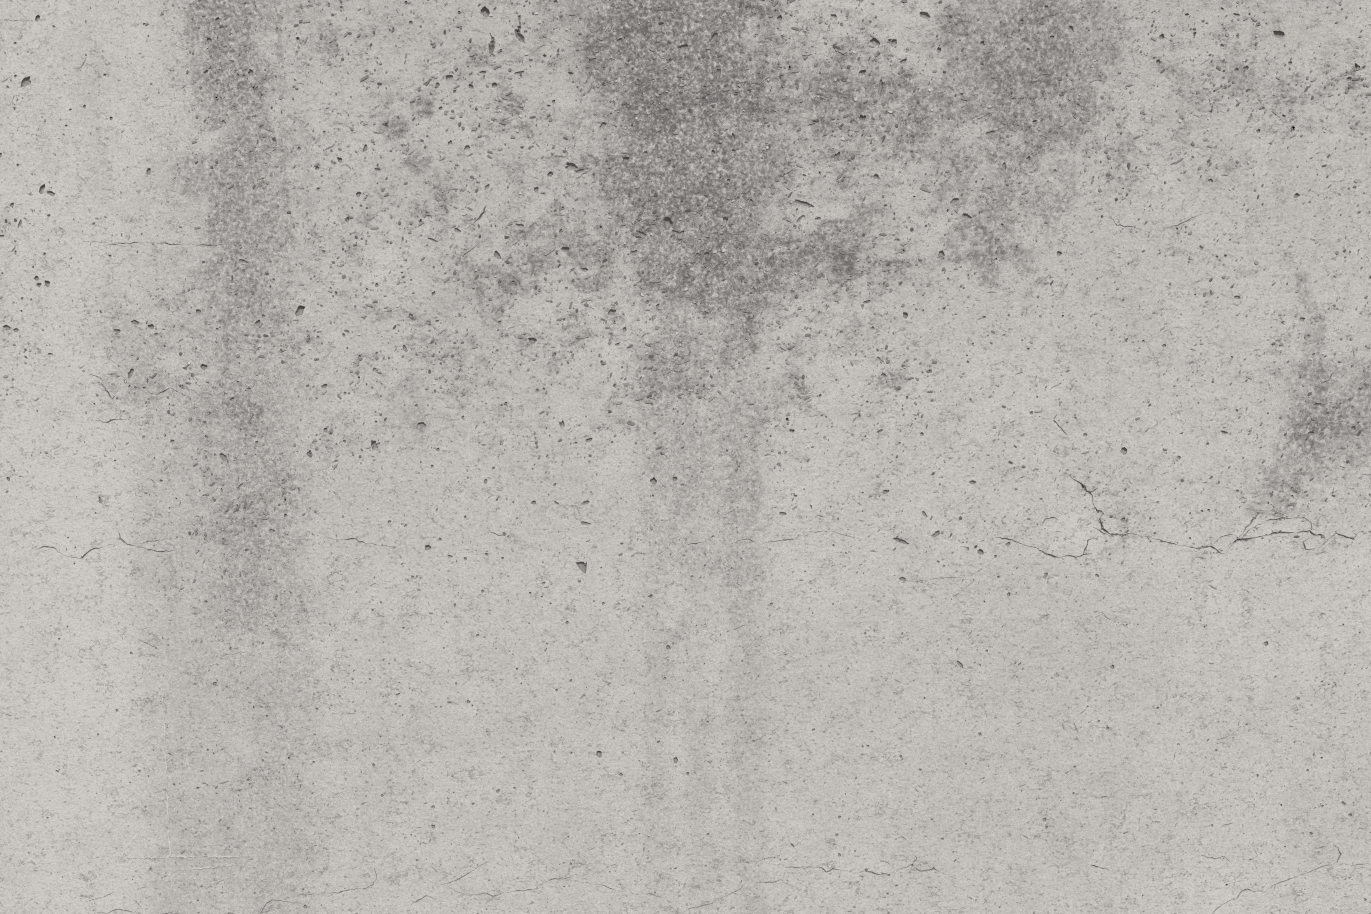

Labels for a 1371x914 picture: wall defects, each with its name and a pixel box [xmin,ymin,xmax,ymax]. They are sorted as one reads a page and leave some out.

damp [597,0,877,319]
crack [996,474,1371,560]